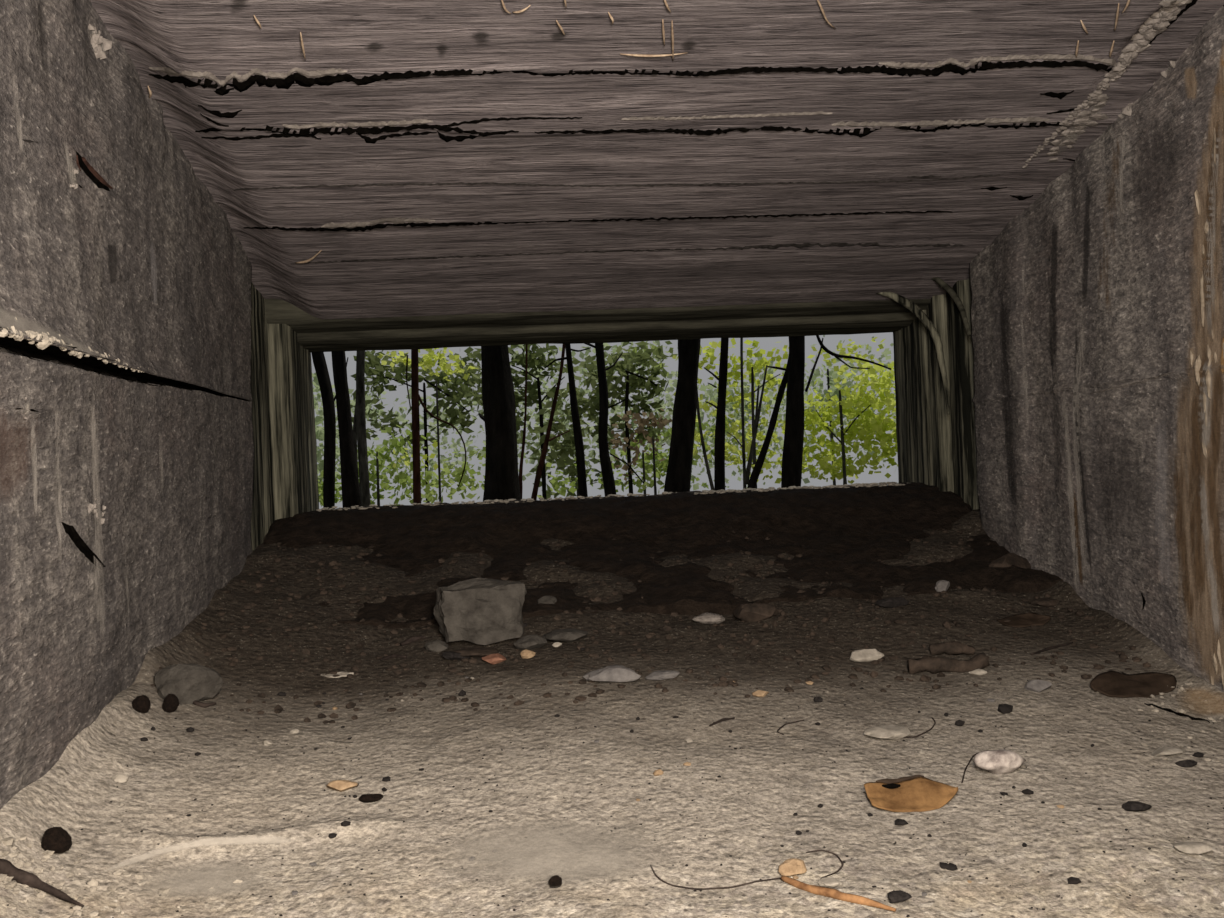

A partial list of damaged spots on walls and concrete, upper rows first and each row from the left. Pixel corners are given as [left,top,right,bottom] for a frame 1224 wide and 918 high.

crack [149,54,1127,144]
spalling [1022,0,1197,168]
crack [234,174,1033,200]
crack [244,210,966,264]
crack [0,318,249,401]
rust [1174,47,1224,688]